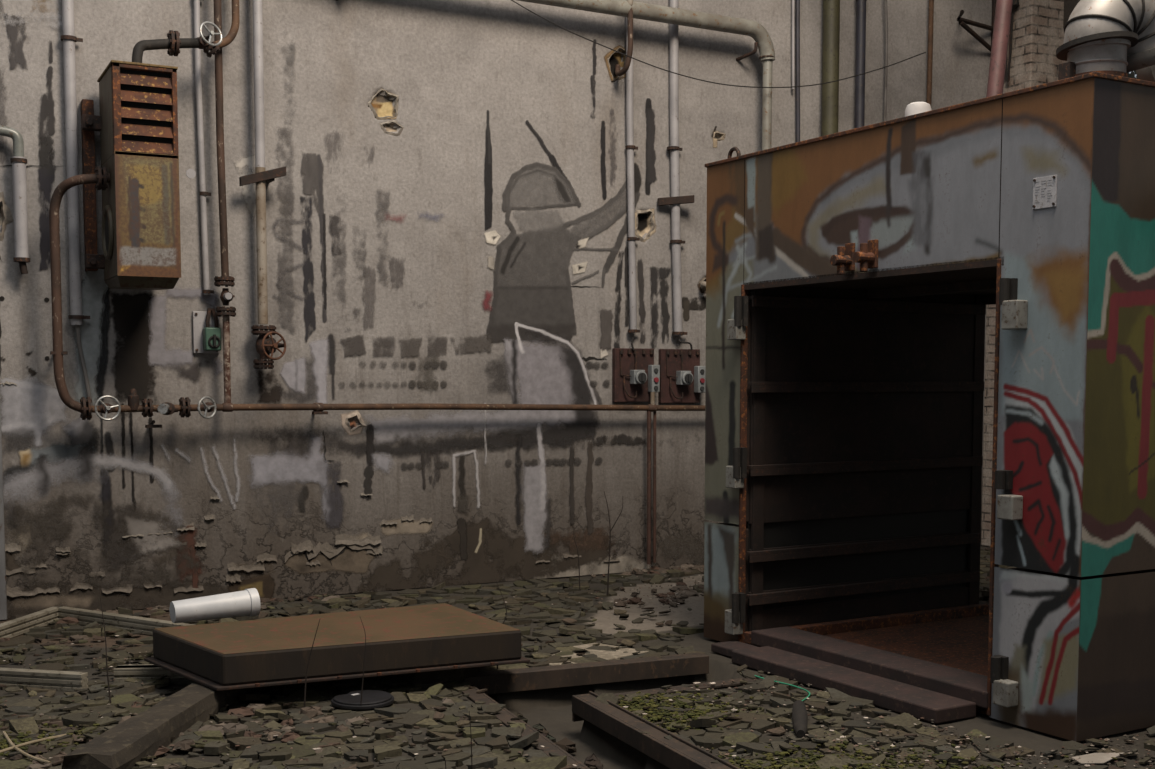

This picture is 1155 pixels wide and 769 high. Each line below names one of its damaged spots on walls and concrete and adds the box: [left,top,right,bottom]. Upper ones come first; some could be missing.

spalling [604,45,626,81]
spalling [368,88,404,136]
leakage [13,404,202,590]
peeling [5,515,433,617]
leakage [354,518,616,593]